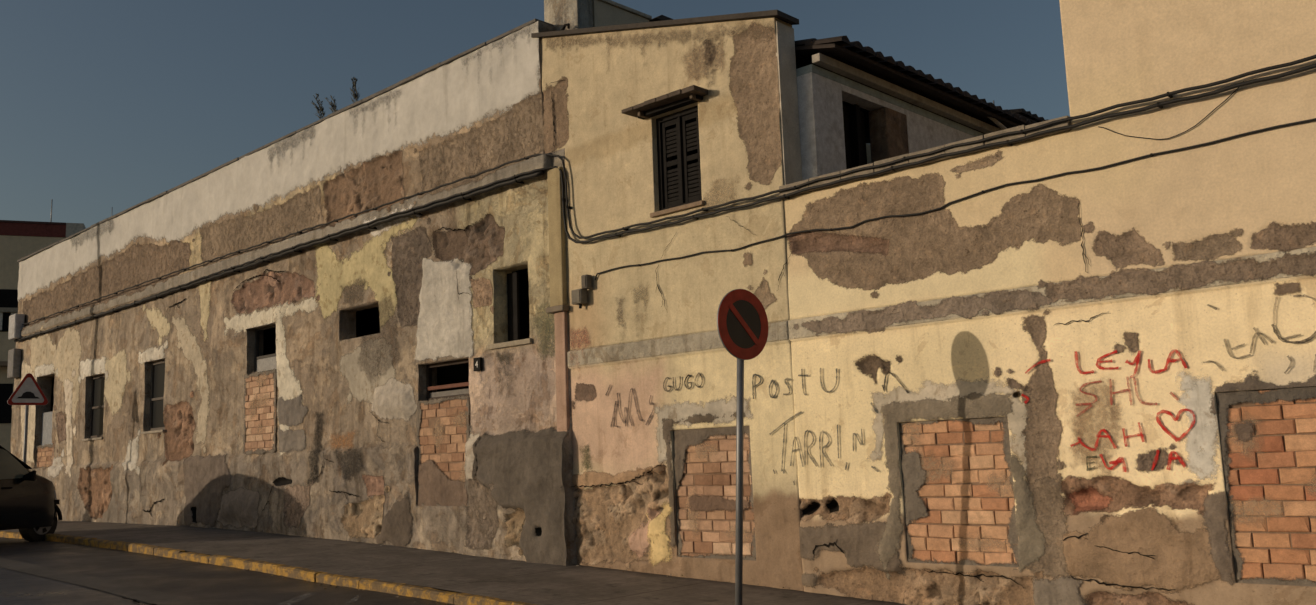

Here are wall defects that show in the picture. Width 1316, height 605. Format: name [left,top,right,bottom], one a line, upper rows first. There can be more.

spalling [21,76,569,478]
flaking render [628,501,672,566]
spalling [729,22,782,189]
spalling [786,150,1316,578]